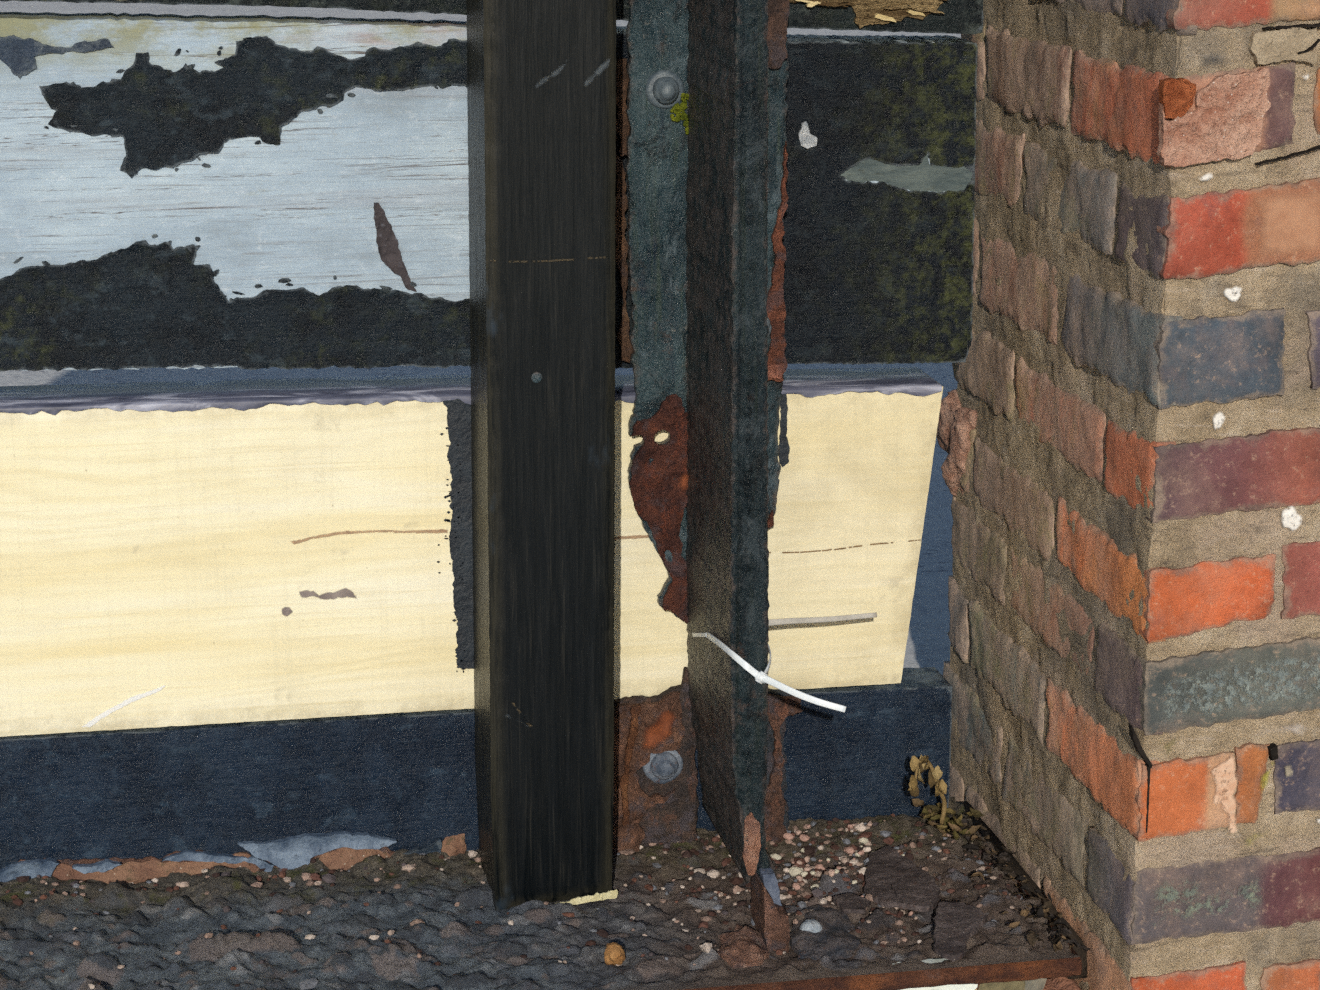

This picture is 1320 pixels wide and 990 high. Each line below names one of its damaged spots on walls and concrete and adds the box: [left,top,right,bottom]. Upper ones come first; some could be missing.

peeling [0,35,113,78]
peeling [39,36,467,178]
rust [767,0,790,69]
spalling [1157,67,1271,167]
crack [1254,145,1320,165]
peeling [0,203,471,372]
rust [766,140,788,382]
rust [629,394,689,623]
rust [612,691,685,855]
rust [742,694,802,876]
crack [1128,722,1153,833]
peeling [0,831,466,884]